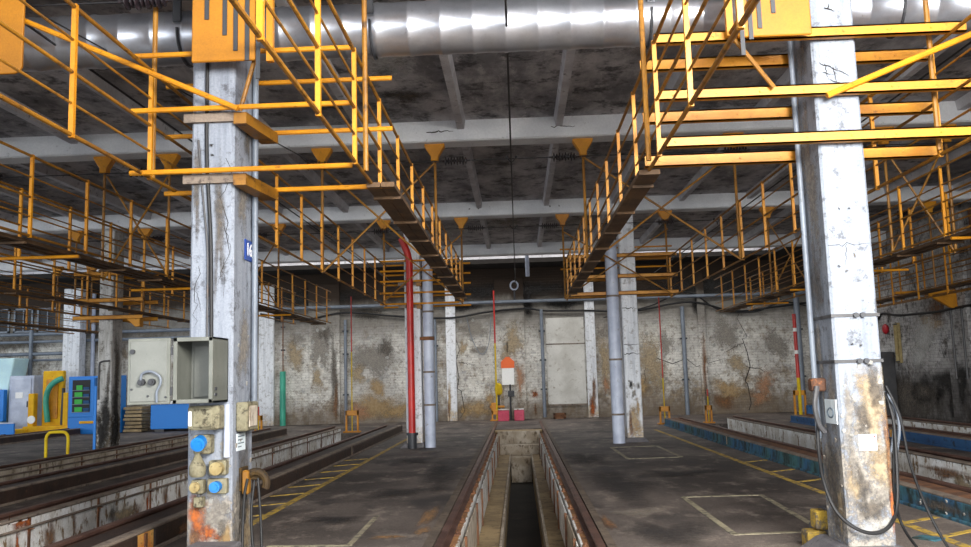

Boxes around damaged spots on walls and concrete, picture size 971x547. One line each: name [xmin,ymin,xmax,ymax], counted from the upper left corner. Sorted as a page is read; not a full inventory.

crack [819,62,849,83]
crack [624,314,765,410]
leakage [353,380,406,417]
rust [180,503,222,544]